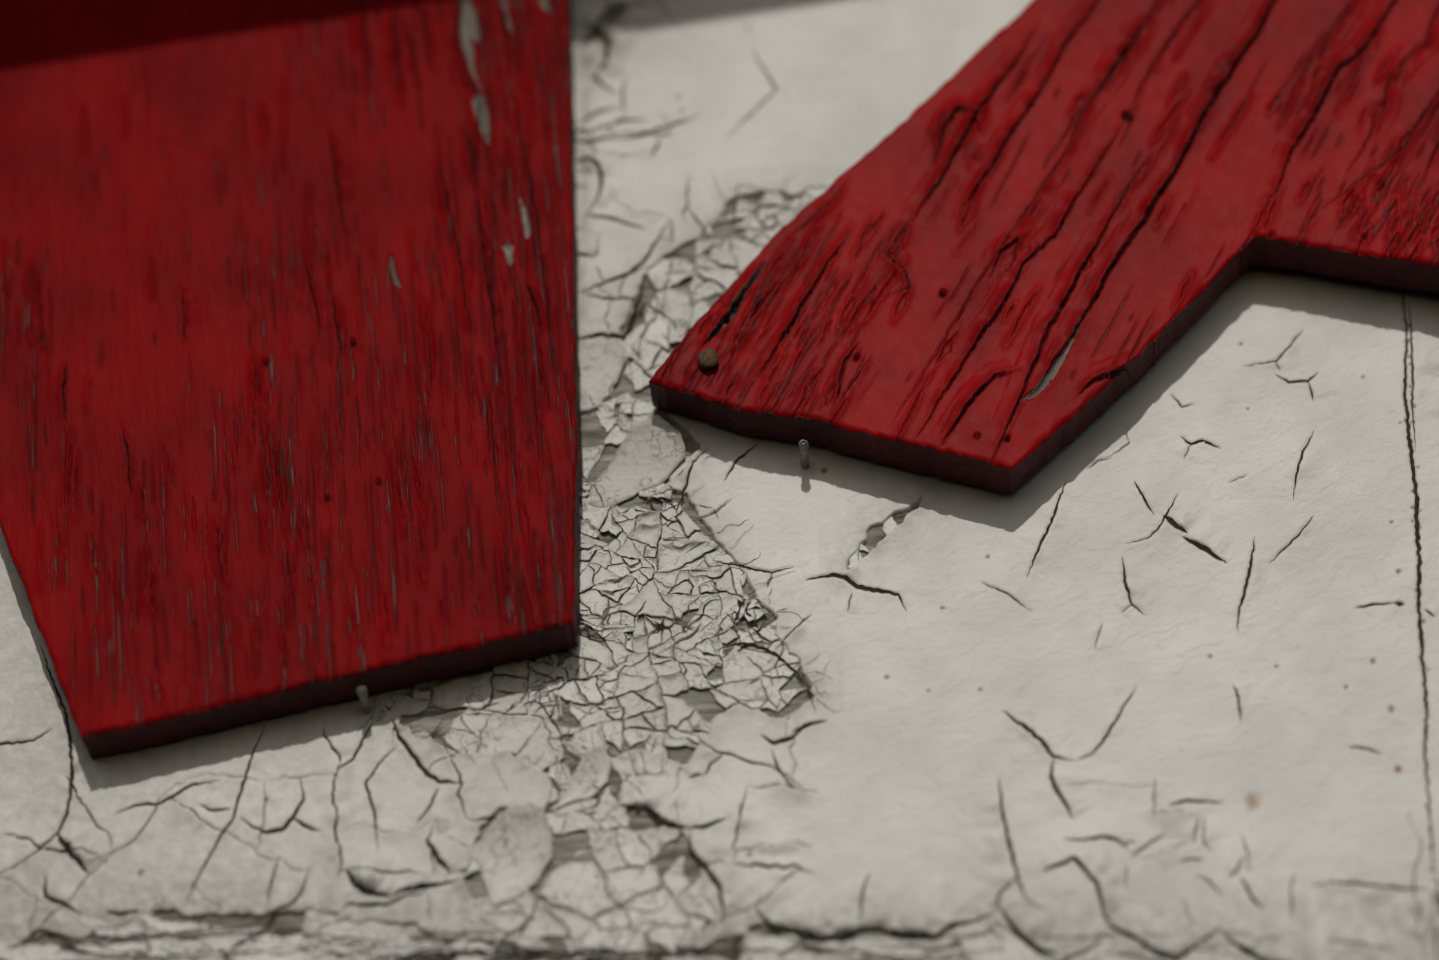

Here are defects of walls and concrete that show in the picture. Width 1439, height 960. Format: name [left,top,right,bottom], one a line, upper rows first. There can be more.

crack [438,0,503,389]
crack [514,24,847,386]
crack [896,0,1276,461]
peeling [0,173,1257,960]
crack [0,288,1439,960]